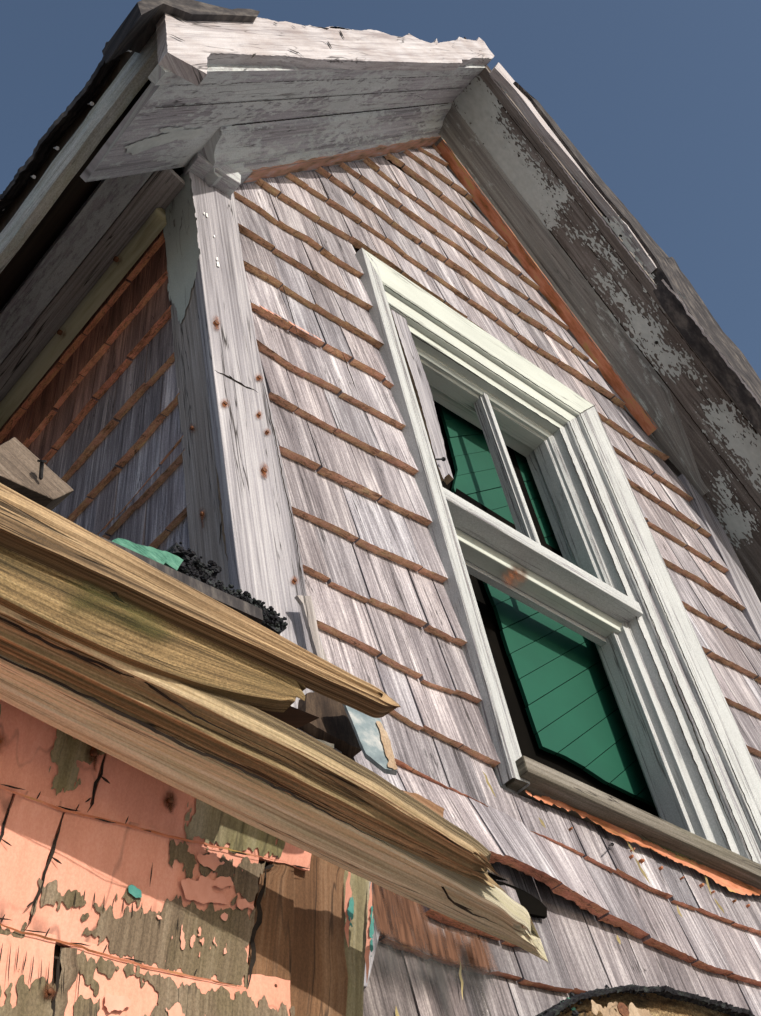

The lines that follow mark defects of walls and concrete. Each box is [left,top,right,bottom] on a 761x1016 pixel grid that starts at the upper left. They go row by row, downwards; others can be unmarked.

peeling [163,173,208,324]
peeling [452,75,761,550]
crack [215,369,304,589]
peeling [49,729,105,796]
crack [0,617,253,745]
peeling [0,798,295,1016]
crack [0,754,310,1016]
crack [0,656,389,846]
crack [441,886,497,924]
peeling [525,790,761,896]